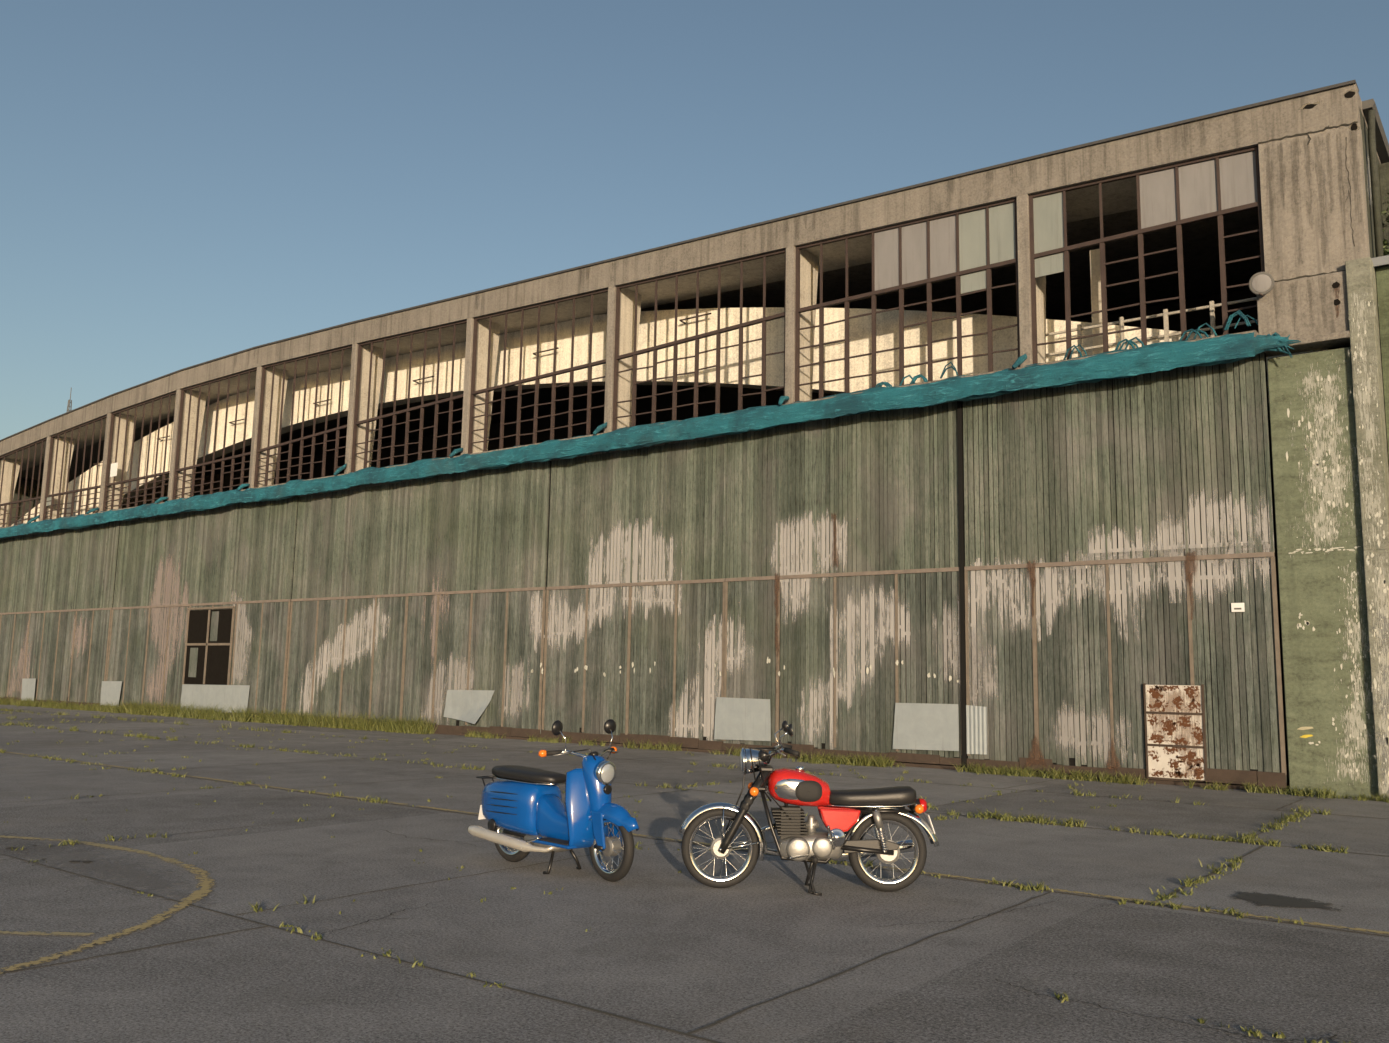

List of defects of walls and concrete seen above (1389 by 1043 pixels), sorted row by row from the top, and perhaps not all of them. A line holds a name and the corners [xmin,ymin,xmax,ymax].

peeling [299,598,390,714]
peeling [499,518,682,719]
peeling [771,510,847,621]
peeling [800,587,911,750]
peeling [927,289,1389,794]
rust [1147,685,1205,780]